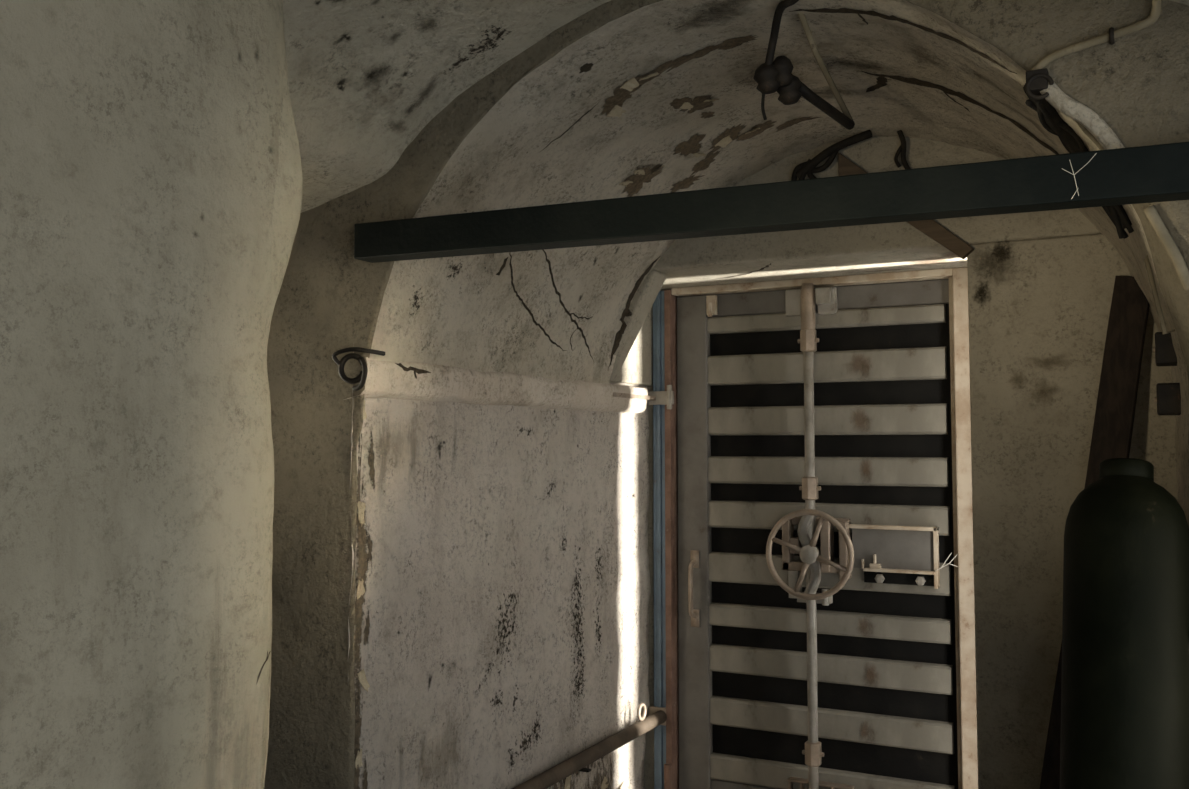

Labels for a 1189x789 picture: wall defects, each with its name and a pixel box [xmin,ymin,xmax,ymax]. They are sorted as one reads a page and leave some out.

crack [496,250,594,363]
water stain [475,586,523,719]
water stain [562,526,602,706]
water stain [508,712,540,774]